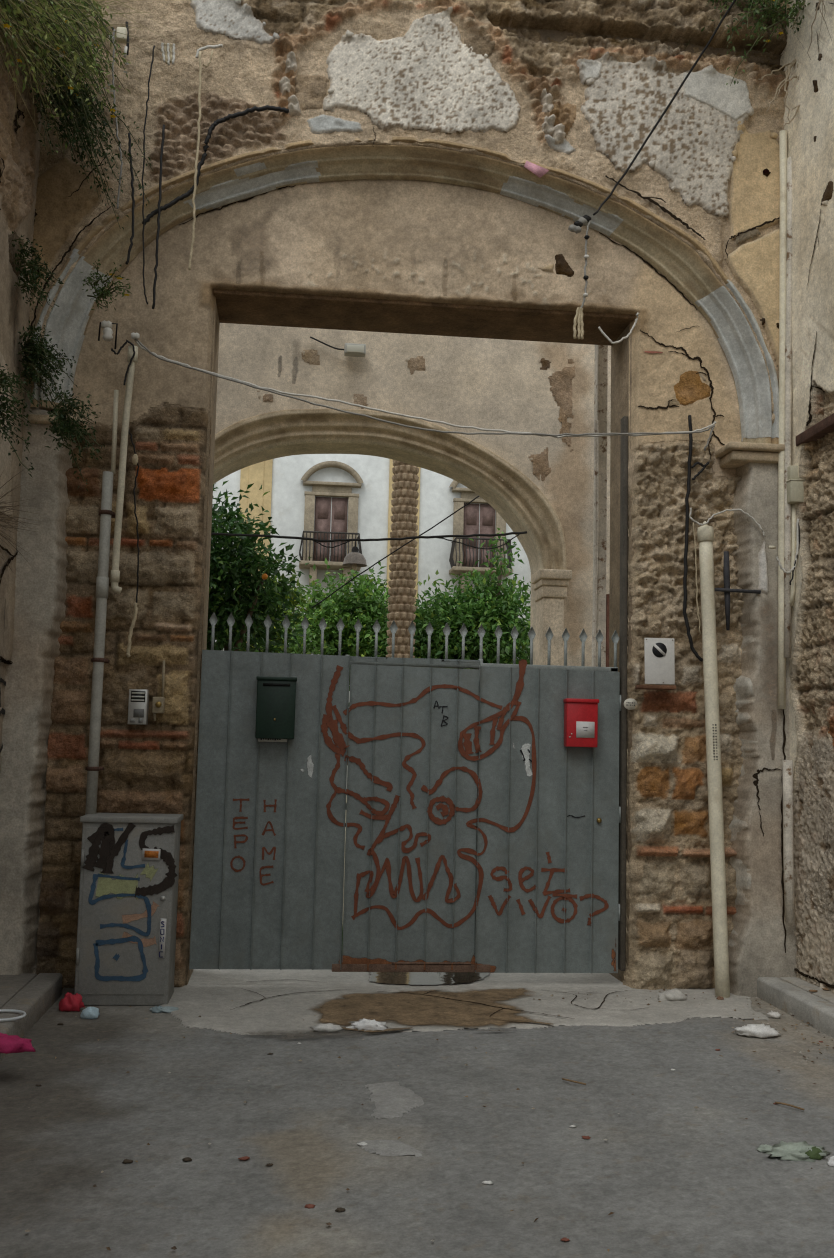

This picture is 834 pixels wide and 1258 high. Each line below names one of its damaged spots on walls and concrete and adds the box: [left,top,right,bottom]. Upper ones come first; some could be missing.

flaking render [190,0,280,45]
flaking render [279,7,521,134]
crack [0,103,25,210]
peeling [183,161,321,210]
peeling [500,176,623,236]
flaking render [540,52,780,442]
crack [605,175,780,258]
crack [807,209,821,285]
crack [599,232,725,459]
flaking render [733,676,760,779]
crack [753,709,834,989]